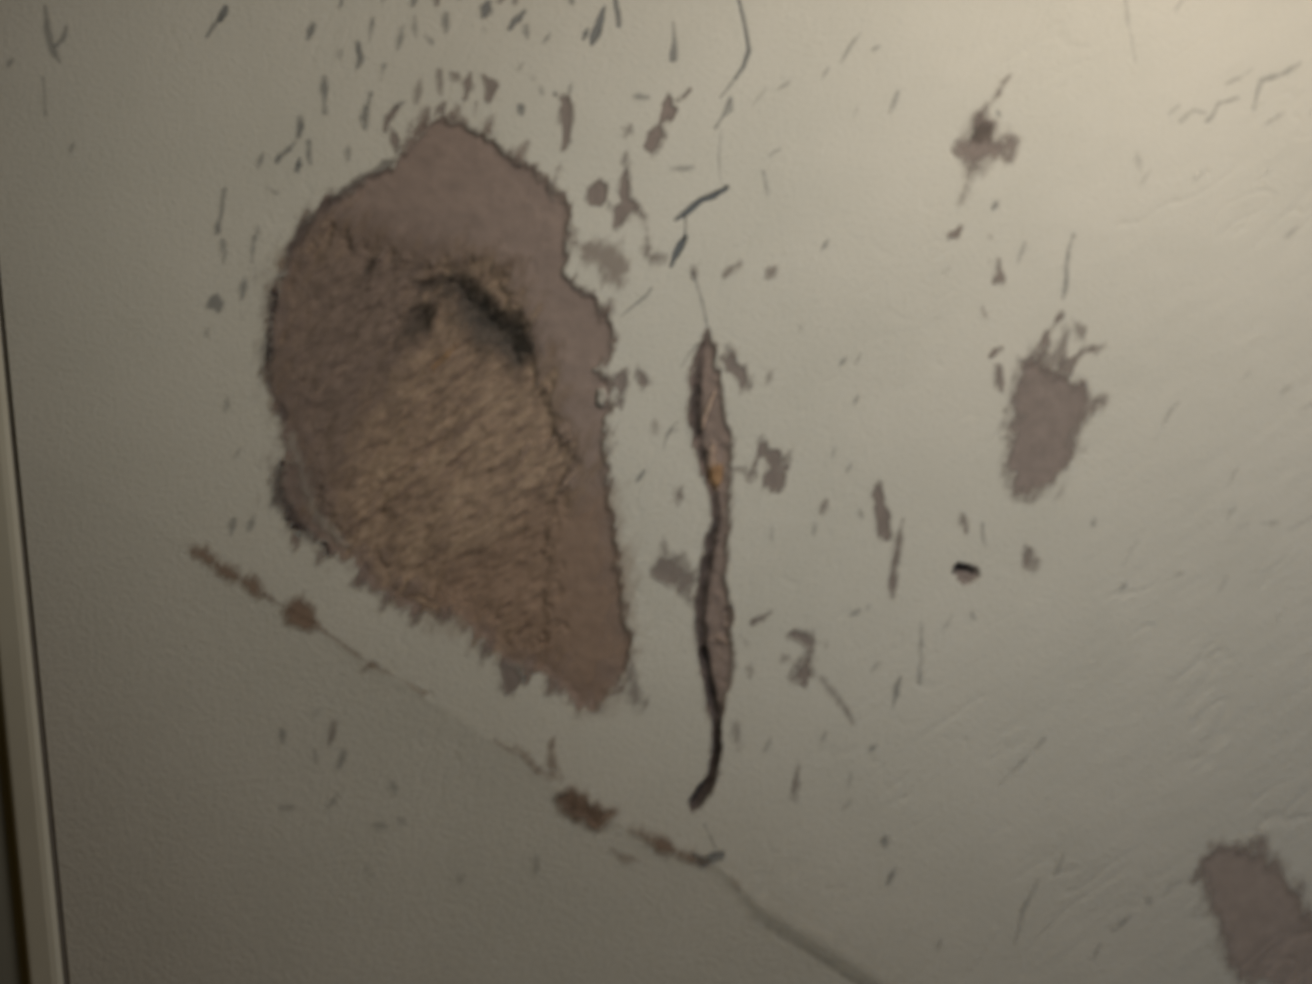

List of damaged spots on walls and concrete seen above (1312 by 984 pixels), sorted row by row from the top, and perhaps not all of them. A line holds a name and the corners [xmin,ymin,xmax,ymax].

peeling [464,73,498,101]
peeling [482,1,491,17]
crack [725,0,750,110]
spalling [266,96,647,711]
peeling [989,314,1104,500]
peeling [749,442,789,492]
crack [688,330,734,809]
peeling [953,564,979,584]
peeling [1199,838,1312,984]